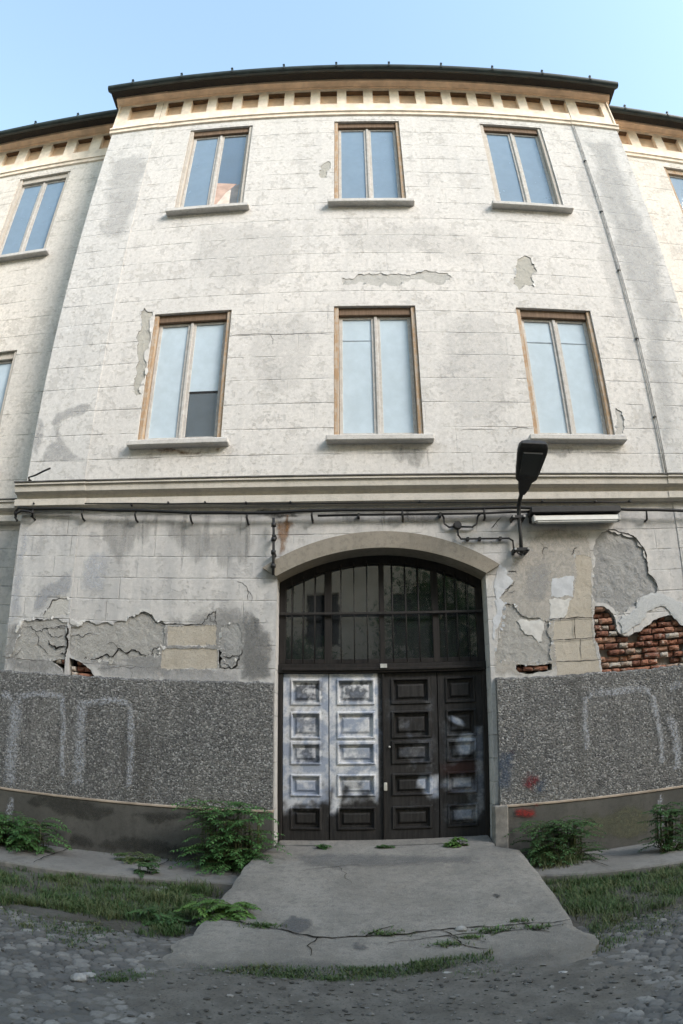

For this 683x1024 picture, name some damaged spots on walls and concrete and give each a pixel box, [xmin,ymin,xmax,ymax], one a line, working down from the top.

peeling [319,162,331,178]
peeling [342,270,451,287]
peeling [513,256,537,290]
peeling [134,307,153,396]
rust [278,515,290,549]
flaking render [492,565,574,674]
flaking render [592,531,683,672]
flaking render [9,609,166,677]
flaking render [219,622,242,667]
leakage [243,617,272,679]
crack [221,918,570,956]